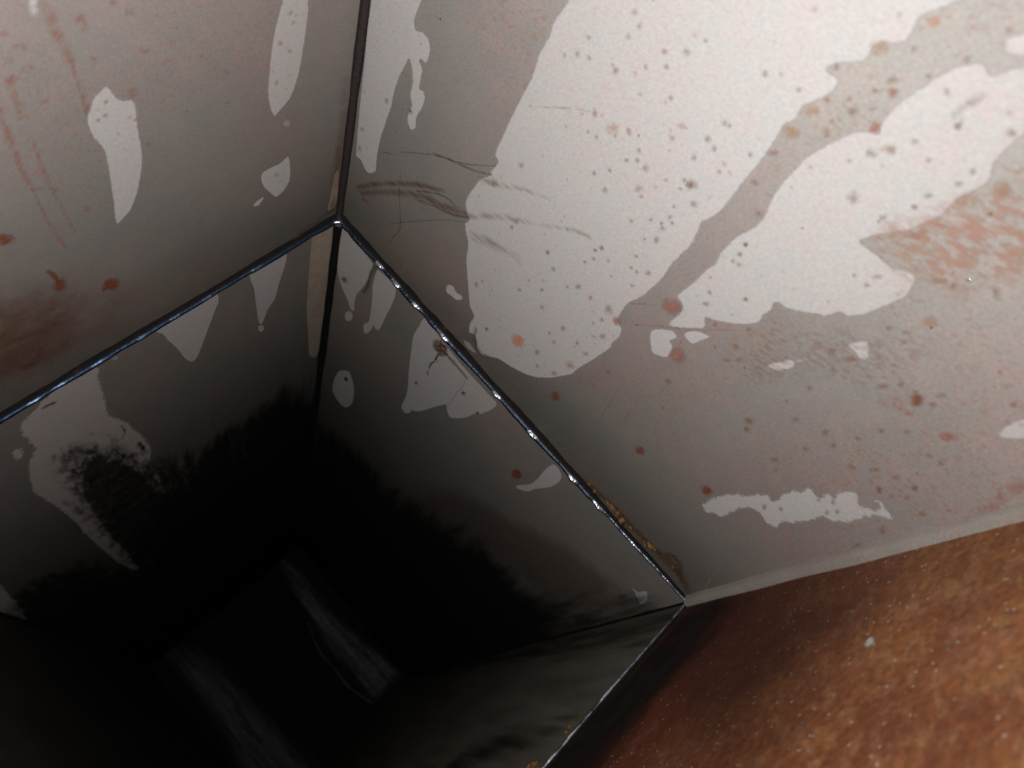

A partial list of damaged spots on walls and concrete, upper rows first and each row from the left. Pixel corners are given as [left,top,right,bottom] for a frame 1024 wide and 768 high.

peeling [268,0,309,127]
peeling [356,0,430,173]
peeling [87,86,142,224]
peeling [156,294,219,362]
peeling [249,254,287,332]
peeling [401,318,497,418]
peeling [446,0,959,378]
peeling [650,33,1024,357]
corrosion [905,199,1024,277]
peeling [11,367,166,570]
corrosion [586,482,688,590]
peeling [702,488,893,528]